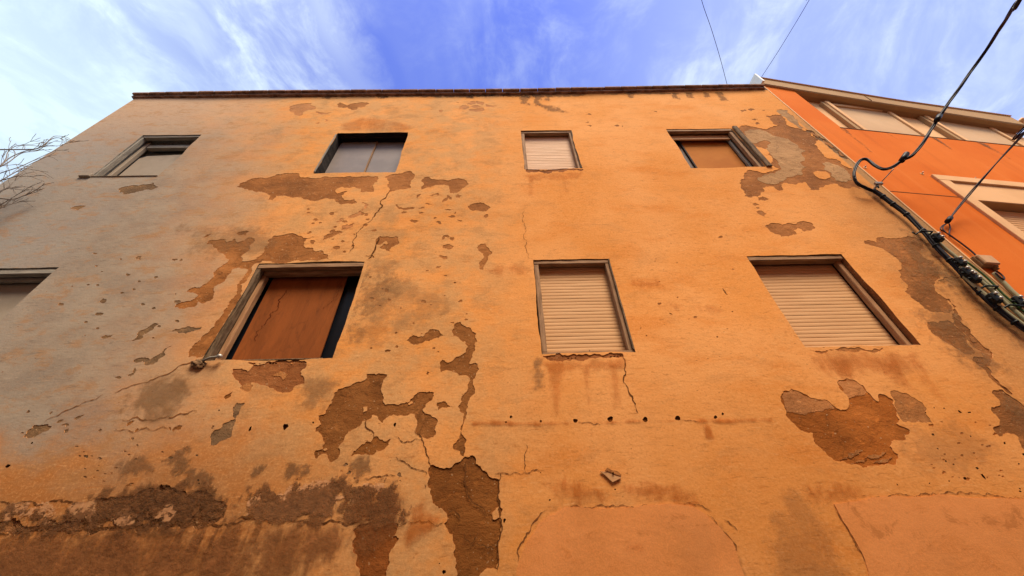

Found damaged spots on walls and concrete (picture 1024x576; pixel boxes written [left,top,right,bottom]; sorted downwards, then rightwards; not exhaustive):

peeling [173,171,492,358]
crack [350,190,390,259]
spalling [732,108,861,237]
spalling [0,300,506,576]
crack [399,446,544,570]
spalling [780,236,1024,482]